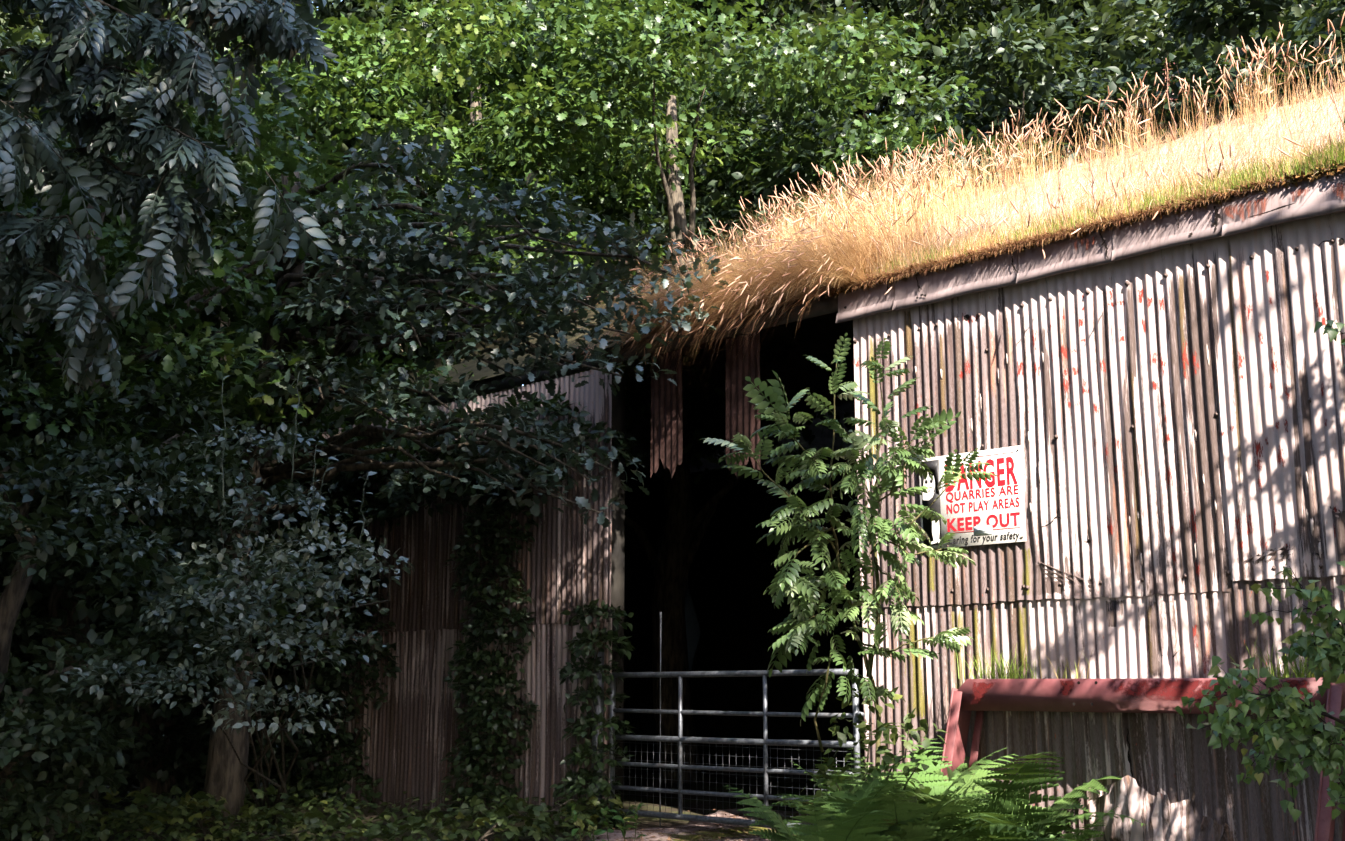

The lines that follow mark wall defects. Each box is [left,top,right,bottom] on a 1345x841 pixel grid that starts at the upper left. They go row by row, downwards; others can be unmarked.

corrosion [1223,197,1267,220]
corrosion [1106,289,1164,331]
corrosion [1149,352,1170,442]
corrosion [1181,343,1199,379]
corrosion [1240,271,1290,493]
water stain [1169,241,1345,676]